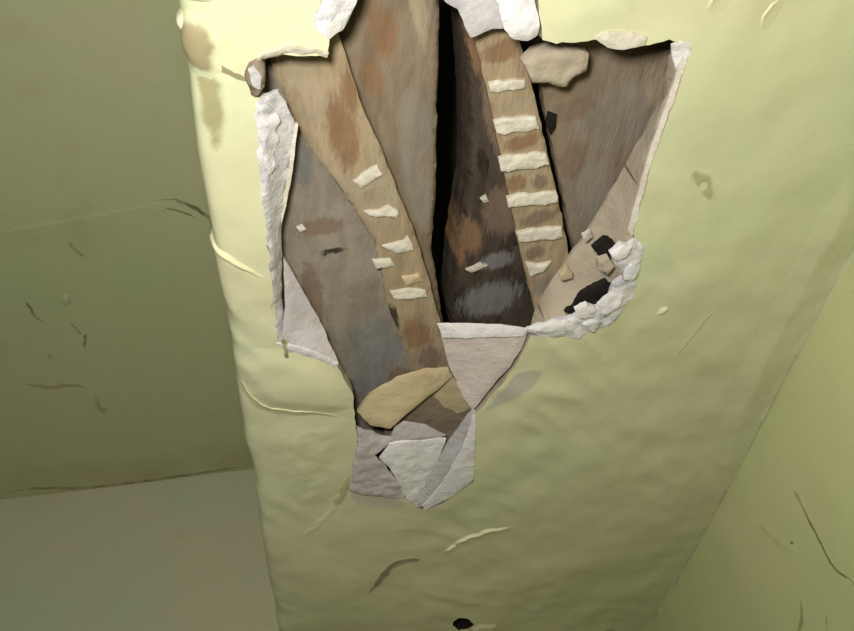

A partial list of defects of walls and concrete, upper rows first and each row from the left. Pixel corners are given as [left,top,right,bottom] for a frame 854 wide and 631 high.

peeling [315,0,357,40]
spalling [495,0,543,41]
spalling [594,31,647,50]
spalling [248,45,329,342]
crack [157,198,212,230]
spalling [474,41,692,414]
crack [25,301,47,325]
spalling [337,361,353,393]
crack [794,491,854,585]
peeling [367,558,420,593]